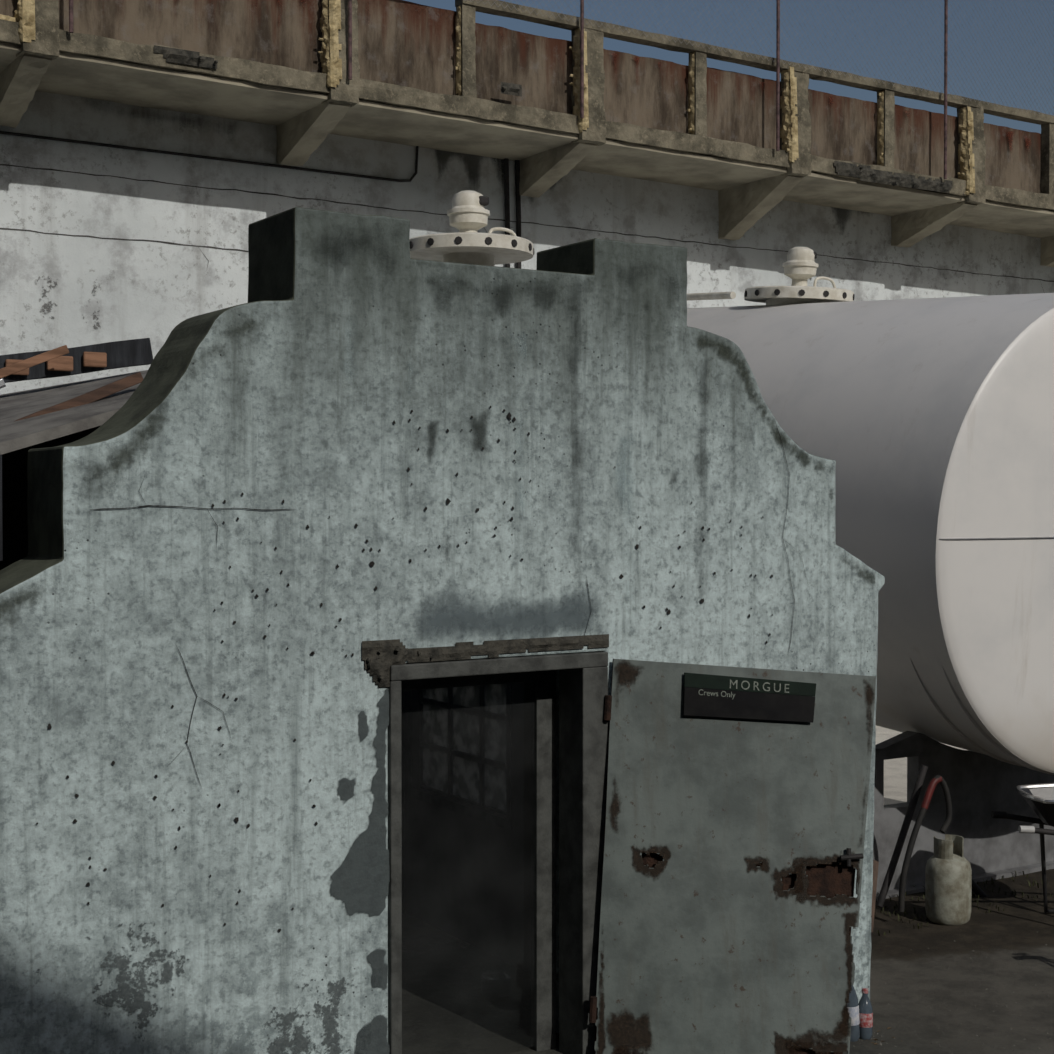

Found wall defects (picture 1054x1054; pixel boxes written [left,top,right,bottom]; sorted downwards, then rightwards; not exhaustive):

crack [0,228,248,271]
crack [177,650,231,788]
peeling [330,634,609,917]